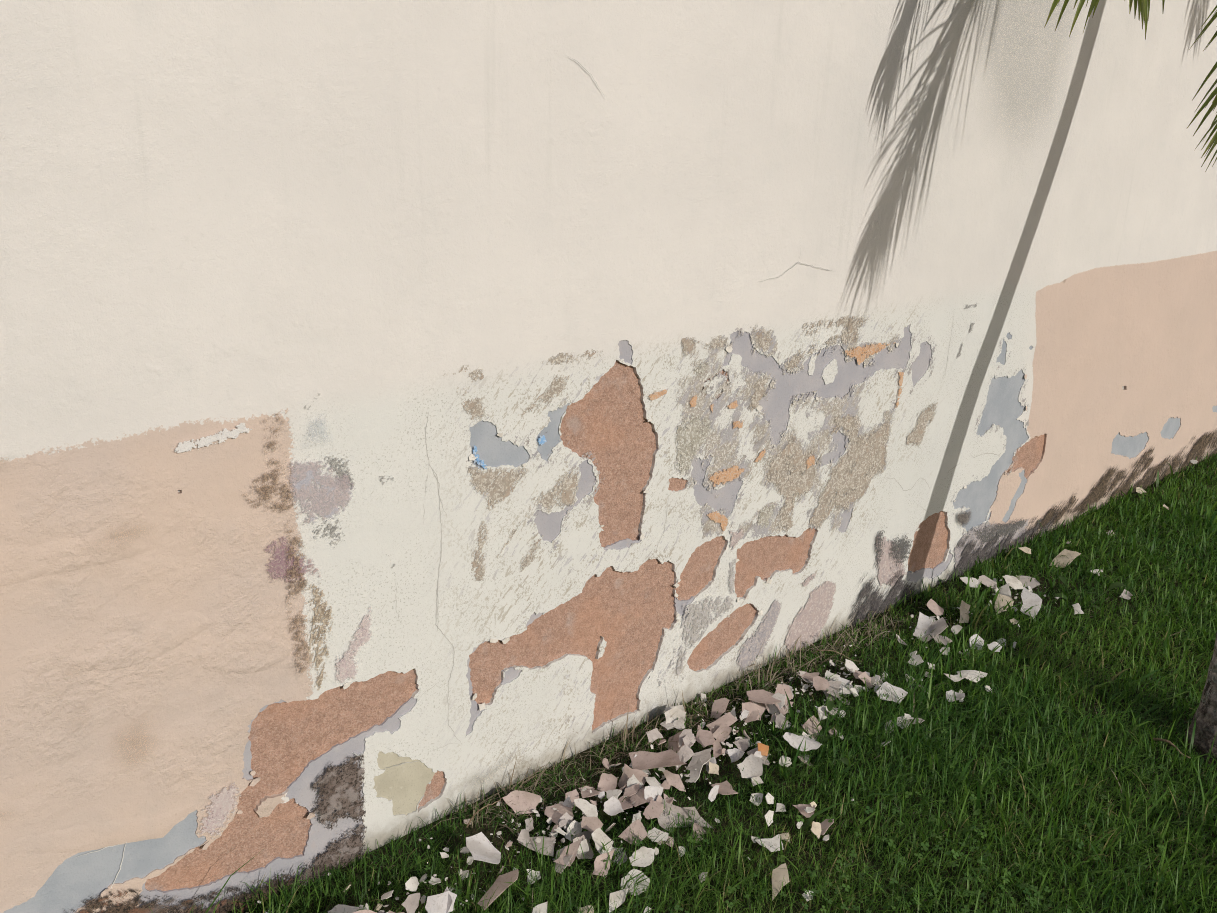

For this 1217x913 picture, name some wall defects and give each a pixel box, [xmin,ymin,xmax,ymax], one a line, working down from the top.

flaking render [460,320,937,734]
damp [849,530,921,628]
peeling [907,333,1045,582]
damp [937,430,1217,587]
peeling [1111,417,1180,459]
flaking render [3,669,417,913]
damp [64,754,367,913]
flaking render [418,770,445,808]